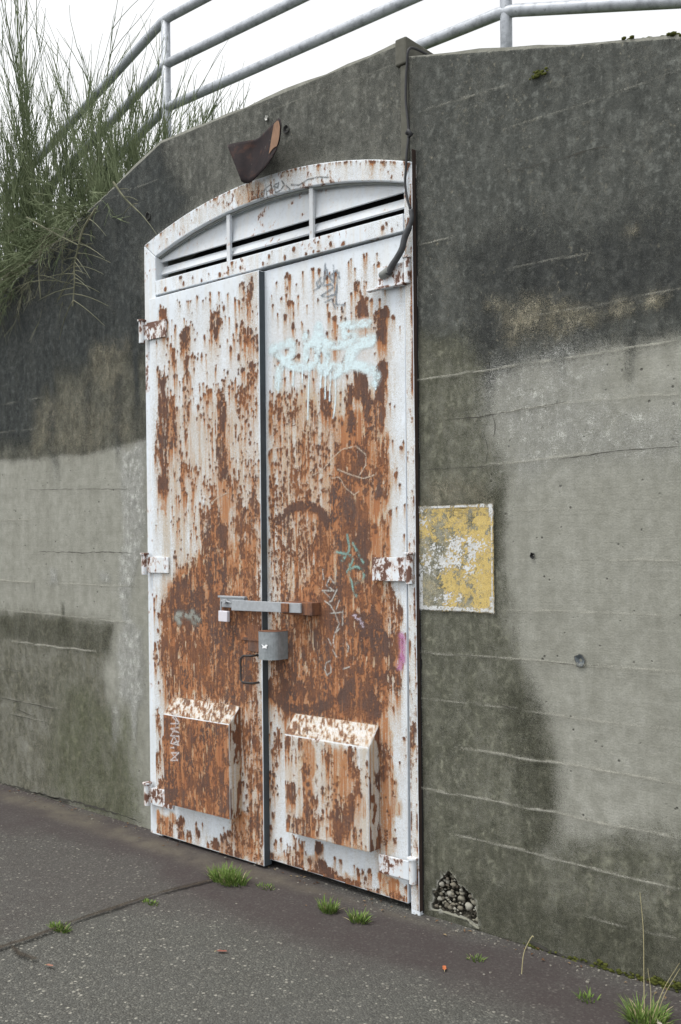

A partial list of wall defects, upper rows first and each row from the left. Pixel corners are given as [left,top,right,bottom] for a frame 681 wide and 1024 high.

leakage [0,47,401,824]
corrosion [269,121,280,153]
corrosion [146,149,423,912]
spalling [432,871,479,930]
peeling [419,503,495,614]
leakage [408,38,681,990]